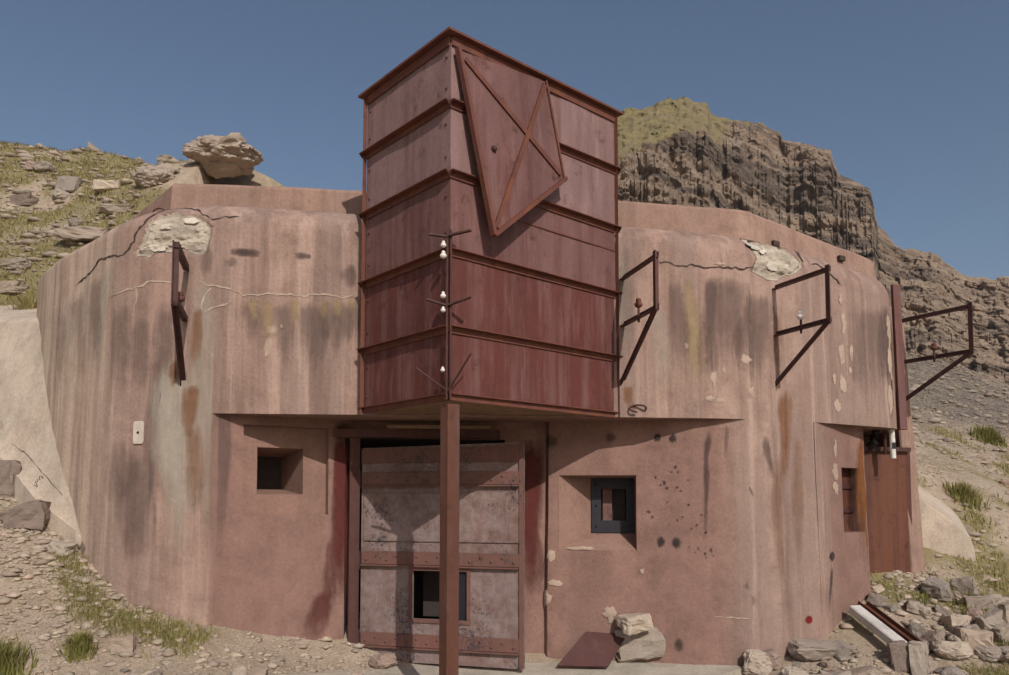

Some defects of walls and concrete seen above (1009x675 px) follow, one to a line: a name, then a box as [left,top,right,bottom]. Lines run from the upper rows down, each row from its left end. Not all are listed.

crack [76,208,239,286]
spalling [136,212,211,257]
spalling [741,239,802,281]
peeling [833,295,853,412]
water stain [153,368,189,512]
corrosion [312,426,348,622]
corrosion [525,447,542,581]